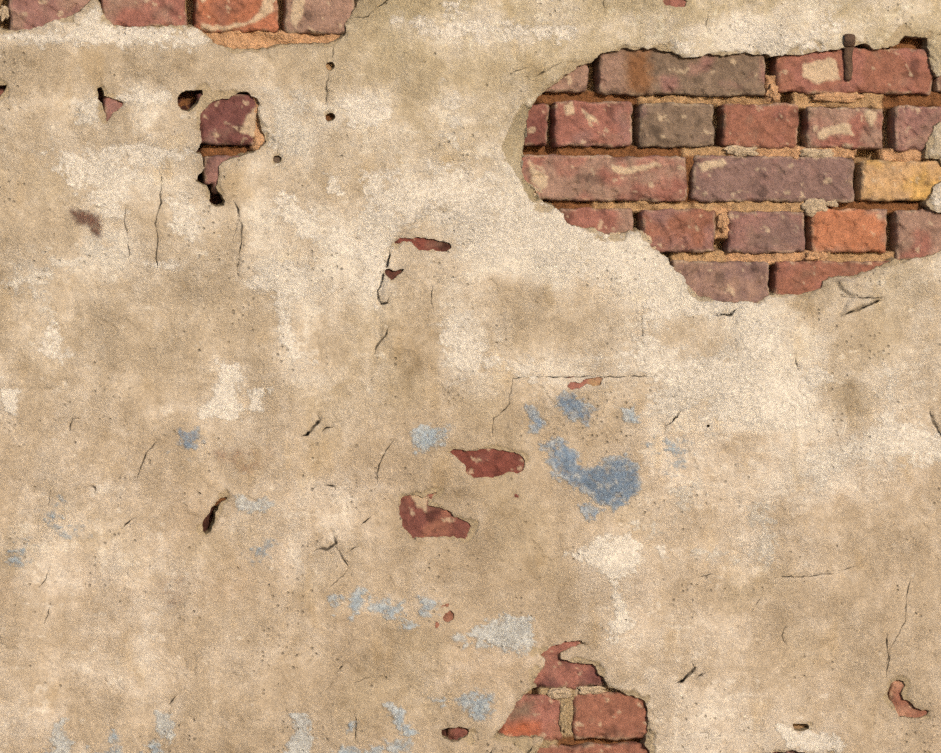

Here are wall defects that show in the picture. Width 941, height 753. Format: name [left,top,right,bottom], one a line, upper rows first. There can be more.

spalling [0,0,359,50]
spalling [136,90,266,207]
spalling [502,35,941,303]
spalling [395,237,452,252]
spalling [385,269,404,280]
spalling [450,448,525,478]
spalling [202,497,227,534]
spalling [399,492,471,539]
spalling [497,640,650,753]
spalling [887,680,929,719]